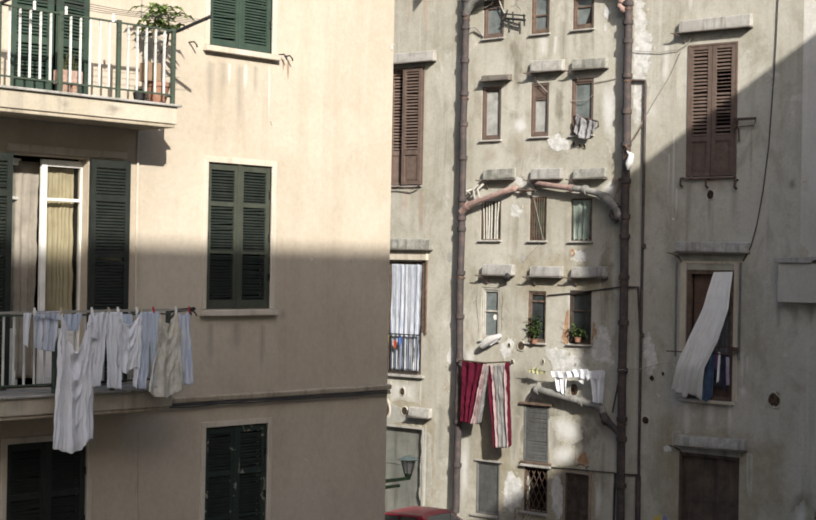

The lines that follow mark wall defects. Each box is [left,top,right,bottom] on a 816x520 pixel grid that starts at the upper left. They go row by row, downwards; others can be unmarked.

peeling [546,130,587,153]
peeling [541,309,616,396]
peeling [642,328,665,382]
peeling [387,380,427,506]
flaking render [502,470,524,516]